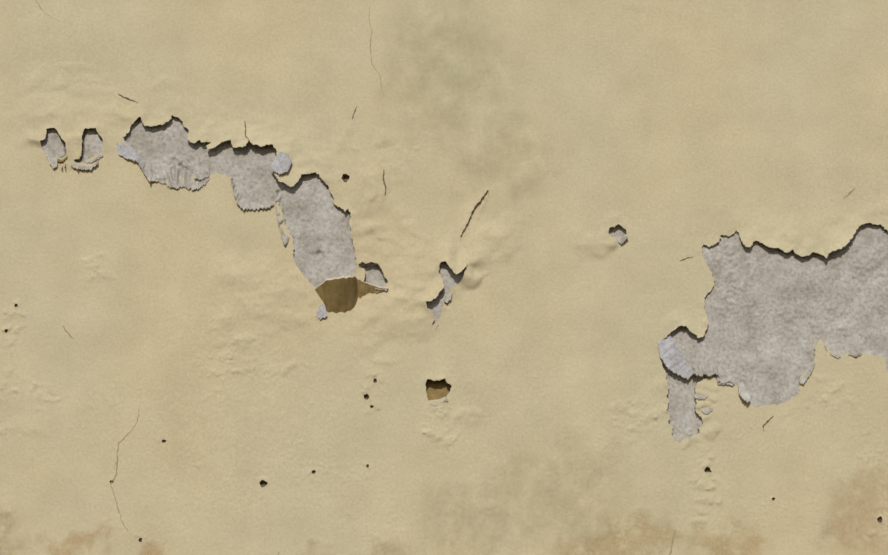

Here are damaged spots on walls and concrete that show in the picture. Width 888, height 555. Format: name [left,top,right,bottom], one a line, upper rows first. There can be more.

peeling [0,71,512,343]
spalling [405,364,491,451]
peeling [563,209,639,261]
peeling [641,181,888,442]